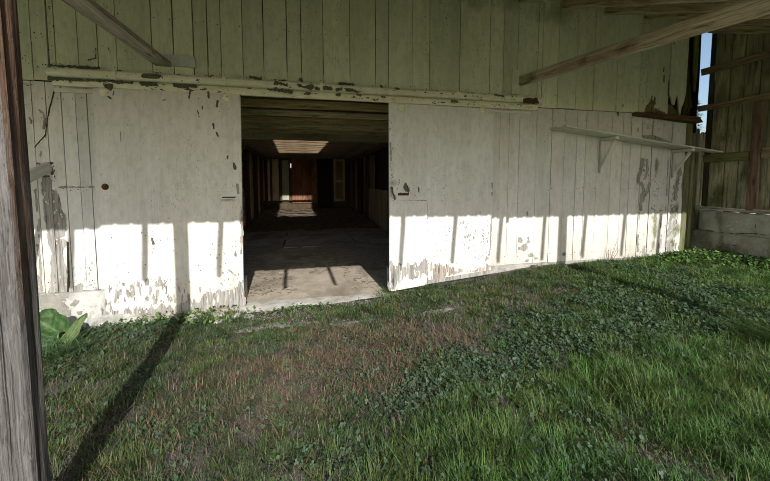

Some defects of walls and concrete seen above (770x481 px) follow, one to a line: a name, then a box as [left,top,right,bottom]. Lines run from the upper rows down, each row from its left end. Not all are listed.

peeling [239,75,386,101]
peeling [387,116,492,291]
peeling [636,158,682,256]
peeling [101,210,246,316]